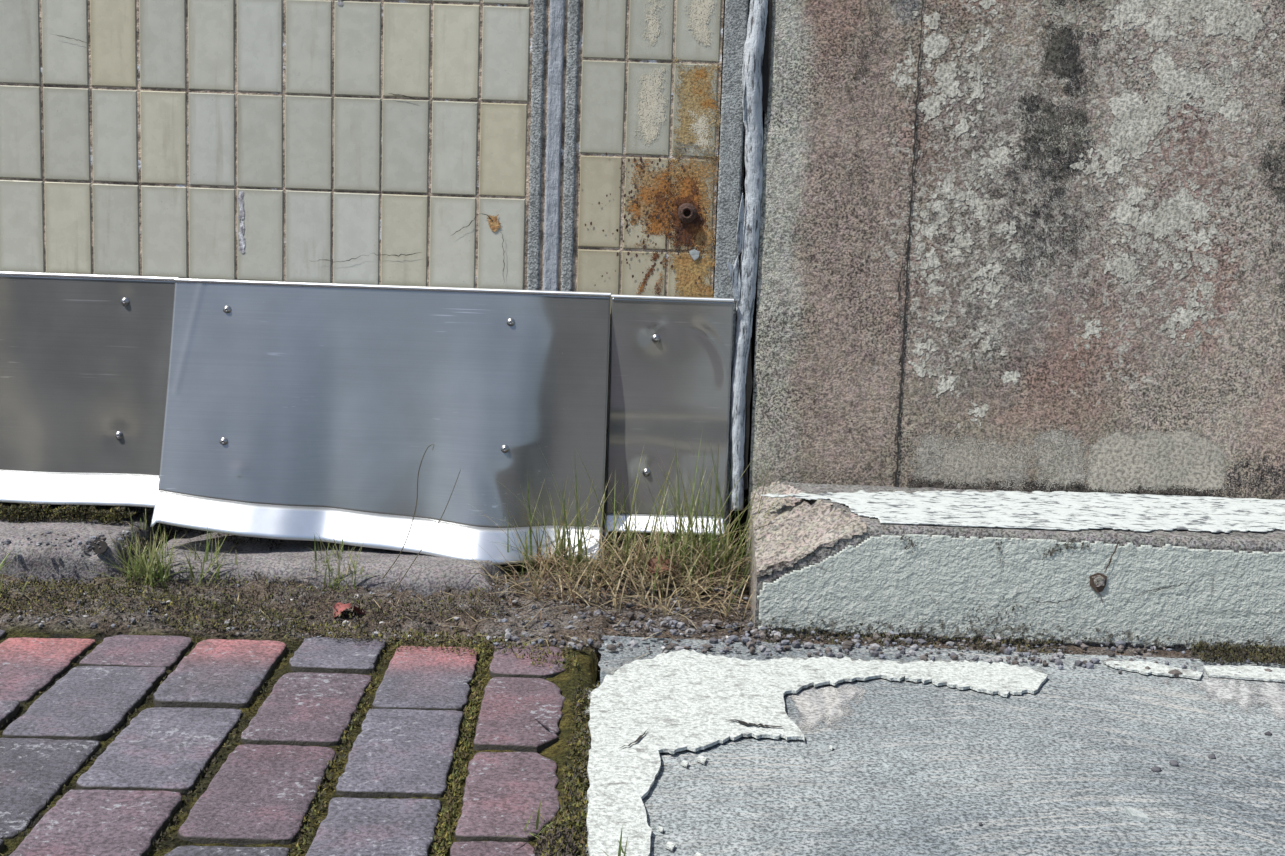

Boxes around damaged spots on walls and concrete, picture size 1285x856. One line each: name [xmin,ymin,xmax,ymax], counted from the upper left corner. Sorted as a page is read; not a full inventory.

corrosion [585,57,721,298]
damp [972,0,1129,310]
damp [1244,0,1285,332]
spalling [751,481,867,577]
damp [904,422,1285,500]
peeling [580,637,1048,856]
peeling [1102,660,1285,720]